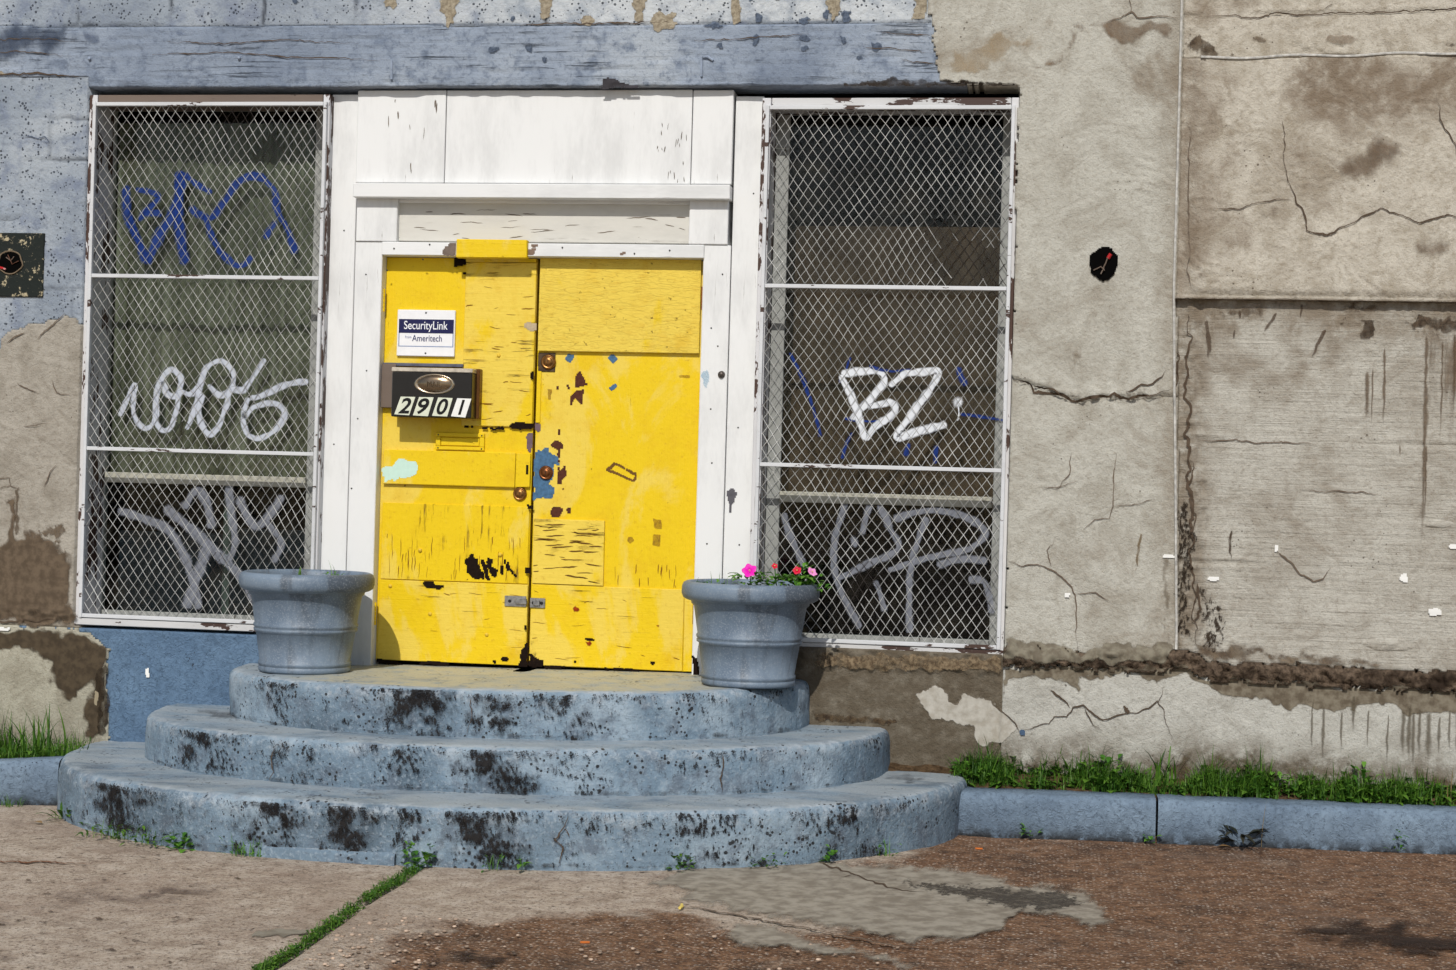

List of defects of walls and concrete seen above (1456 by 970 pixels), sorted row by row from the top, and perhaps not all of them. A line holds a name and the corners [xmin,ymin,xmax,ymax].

peeling [440,0,460,28]
peeling [539,0,552,20]
peeling [632,0,677,32]
peeling [704,0,763,48]
peeling [799,0,882,60]
peeling [912,0,927,20]
crack [1009,122,1456,645]
leakage [1003,502,1456,751]
spalling [94,662,110,735]
peeling [916,685,1025,746]
crack [994,690,1172,736]
leakage [76,678,921,870]